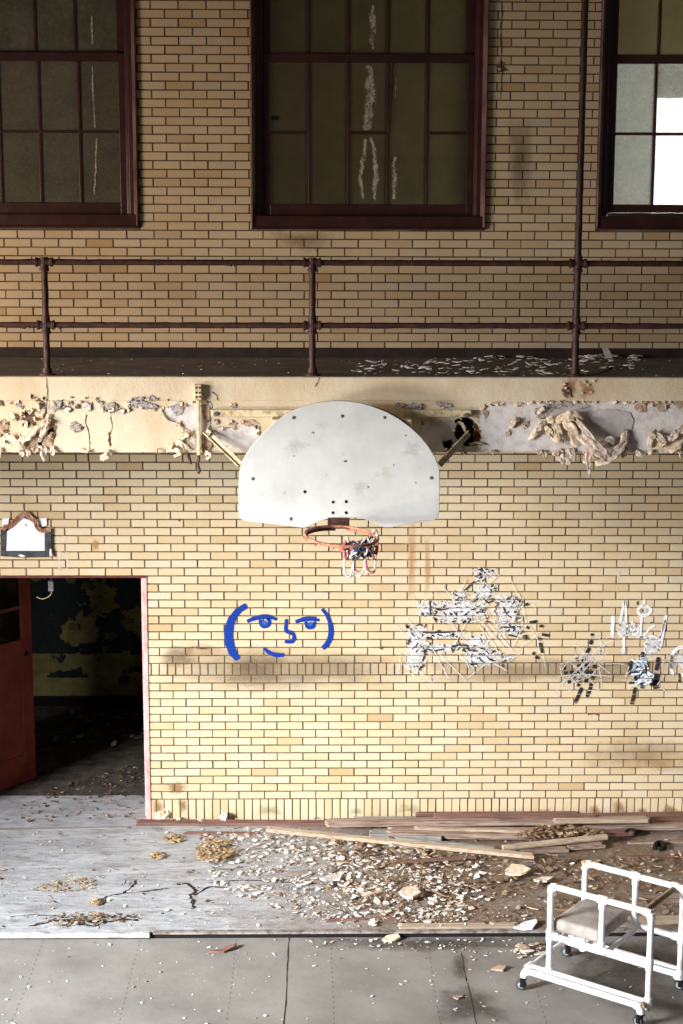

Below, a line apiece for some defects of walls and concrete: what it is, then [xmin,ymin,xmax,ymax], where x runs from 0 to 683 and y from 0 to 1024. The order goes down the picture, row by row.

peeling [0,394,261,462]
peeling [394,400,683,478]
crack [11,880,319,927]